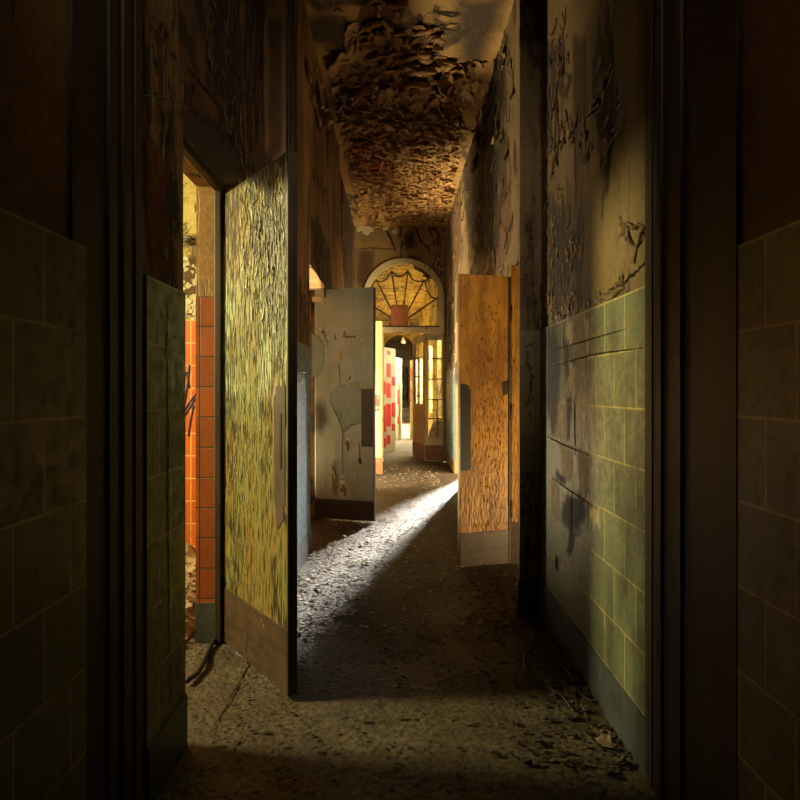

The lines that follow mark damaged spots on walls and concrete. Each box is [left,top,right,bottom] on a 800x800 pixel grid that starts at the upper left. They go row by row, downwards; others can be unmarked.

crack [359,226,436,258]
peeling [305,0,513,372]
peeling [519,12,626,330]
crack [555,329,644,368]